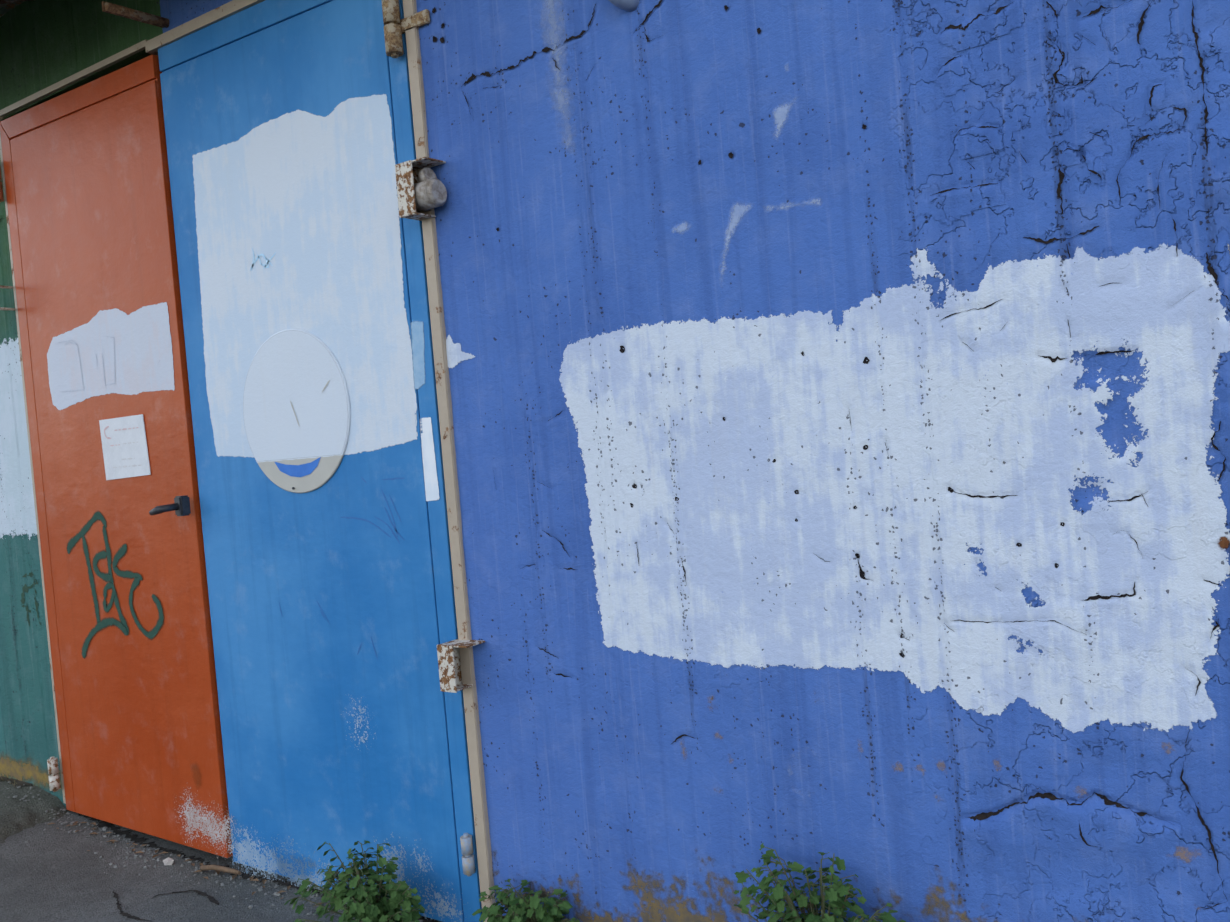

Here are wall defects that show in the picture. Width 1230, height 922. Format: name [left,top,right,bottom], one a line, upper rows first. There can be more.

crack [637,0,663,42]
crack [1046,0,1153,56]
crack [461,4,596,117]
crack [1116,1,1209,252]
crack [1023,162,1099,258]
crack [1176,253,1230,312]
crack [1040,287,1137,362]
crack [1211,421,1226,481]
damp [0,756,62,789]
damp [921,878,997,922]